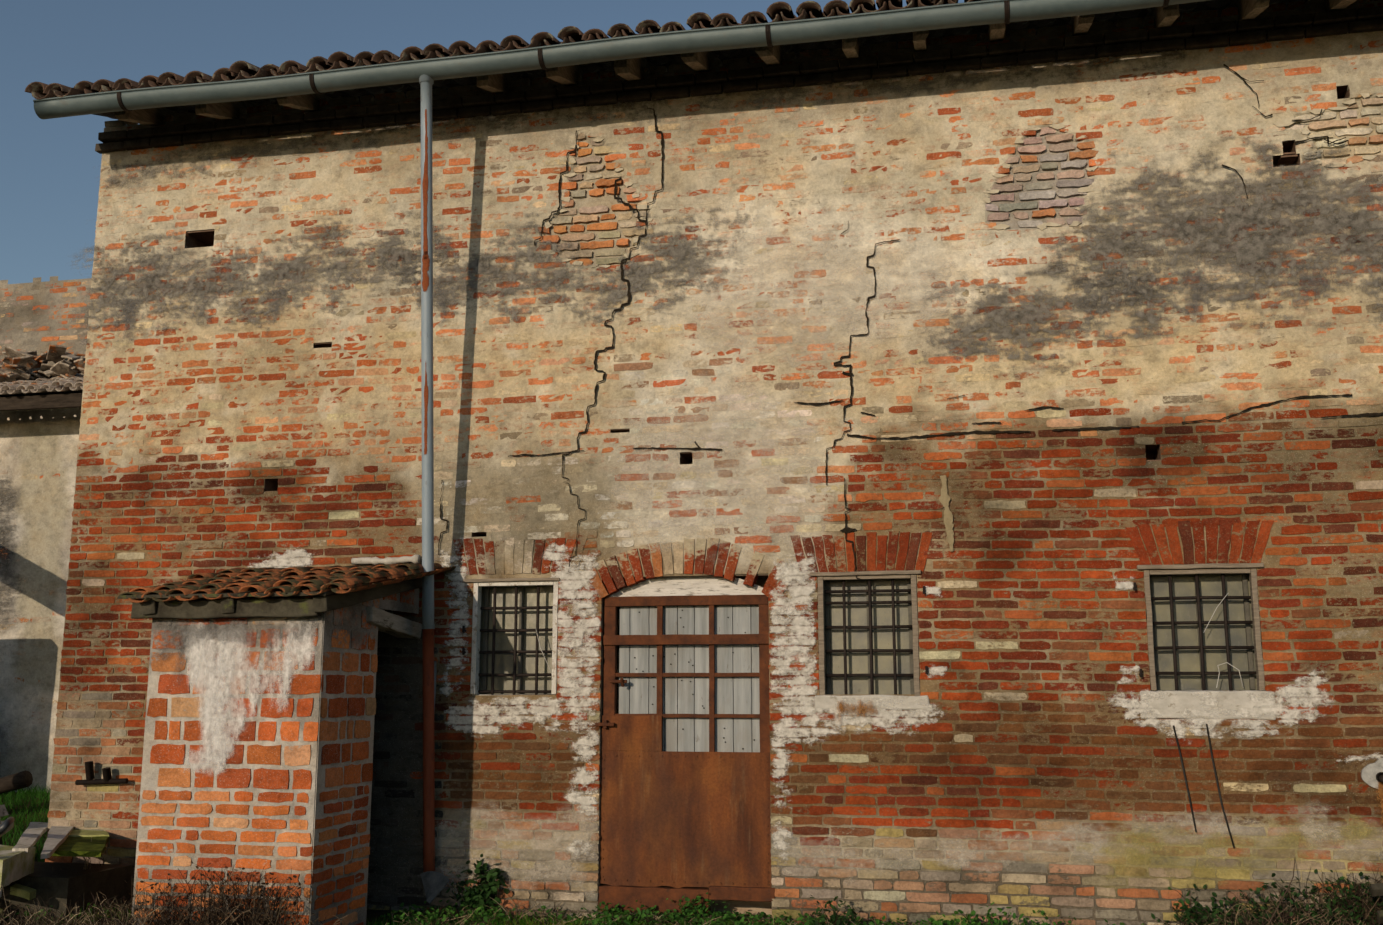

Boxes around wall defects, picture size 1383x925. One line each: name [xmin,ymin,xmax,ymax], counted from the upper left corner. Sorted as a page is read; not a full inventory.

damp [71,208,764,343]
crack [508,107,664,566]
spalling [532,138,653,271]
crack [794,229,1139,580]
spalling [982,124,1099,231]
damp [880,136,1383,372]
crack [1182,394,1383,424]
spalling [1273,93,1383,168]
damp [161,621,315,774]
peeling [440,543,600,820]
peeling [770,554,942,805]
peeling [1110,666,1331,738]